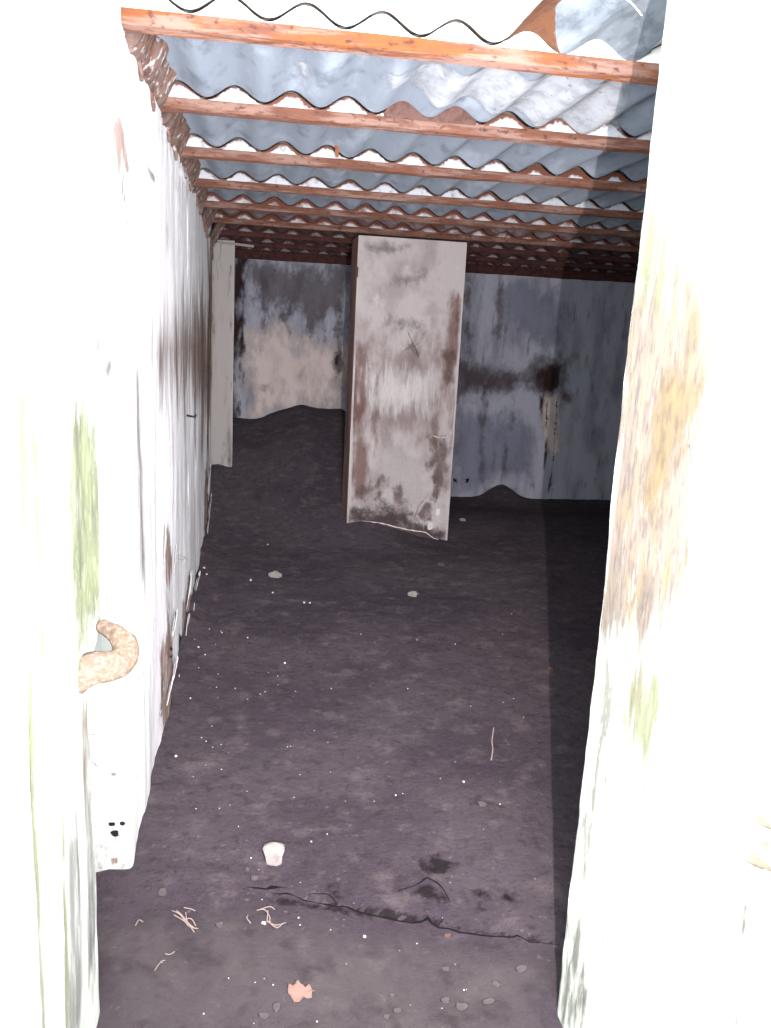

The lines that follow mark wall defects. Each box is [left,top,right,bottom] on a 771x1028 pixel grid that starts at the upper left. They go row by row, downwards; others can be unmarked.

peeling [507,0,667,61]
damp [233,258,351,358]
damp [333,351,342,372]
damp [361,363,434,414]
damp [349,418,532,539]
damp [457,358,569,402]
damp [601,193,723,674]
damp [75,538,83,665]
damp [641,680,658,798]